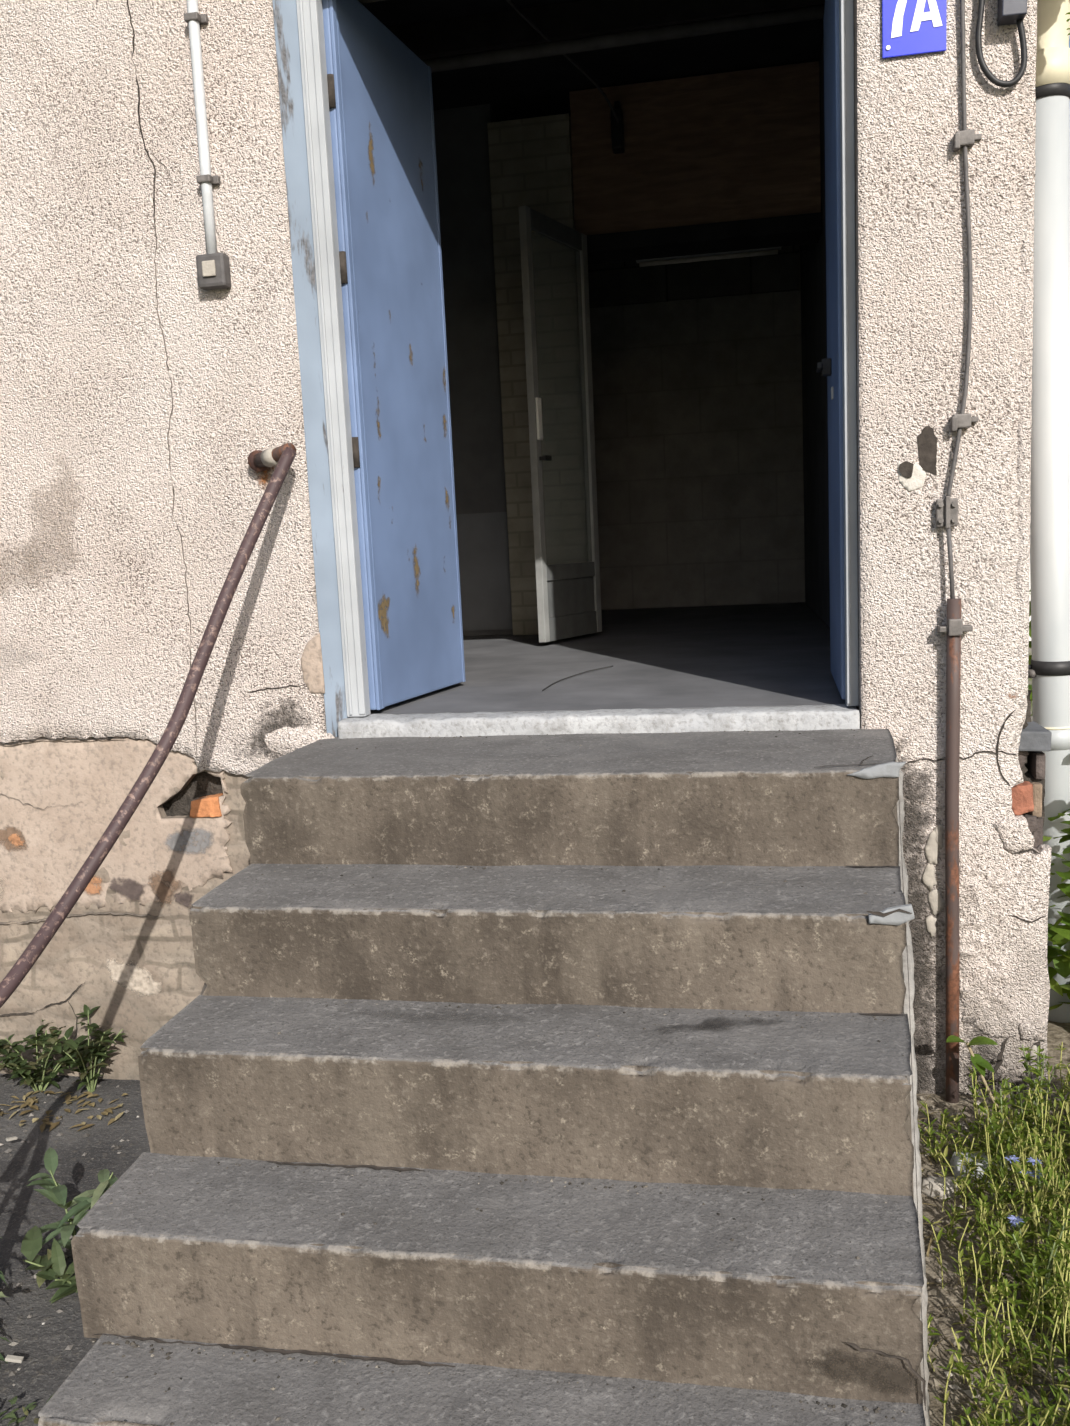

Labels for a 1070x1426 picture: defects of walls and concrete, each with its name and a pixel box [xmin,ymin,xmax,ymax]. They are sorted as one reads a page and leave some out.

crack [127,0,197,766]
spalling [897,461,926,492]
peeling [0,736,233,913]
damp [896,746,938,1094]
peeling [922,824,1046,1063]
spalling [993,691,1052,854]